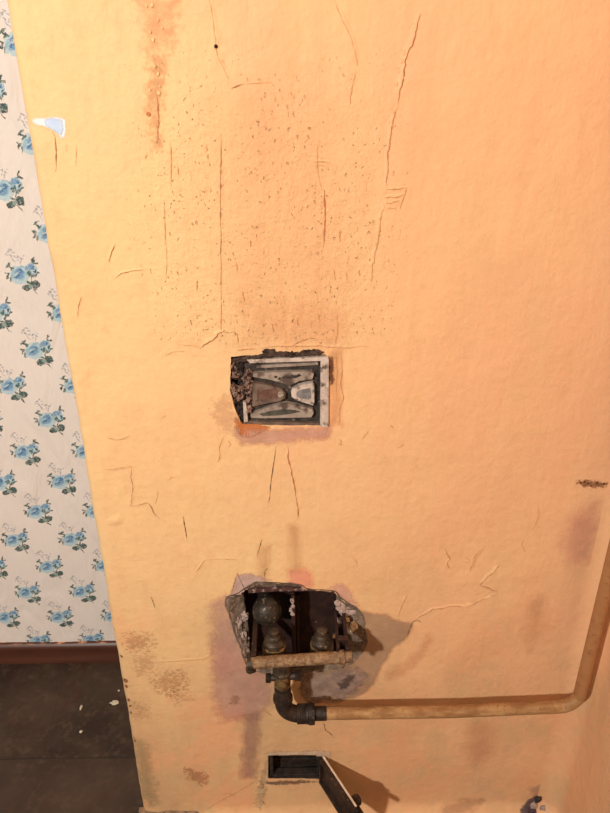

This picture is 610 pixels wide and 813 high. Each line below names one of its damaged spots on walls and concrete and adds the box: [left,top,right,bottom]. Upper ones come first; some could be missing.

crack [209,0,268,88]
crack [368,13,420,283]
crack [168,133,368,445]
spalling [230,362,254,414]
corrosion [235,419,268,438]
crack [103,466,176,519]
crack [269,447,299,516]
crack [408,546,499,633]
peeling [213,574,368,776]